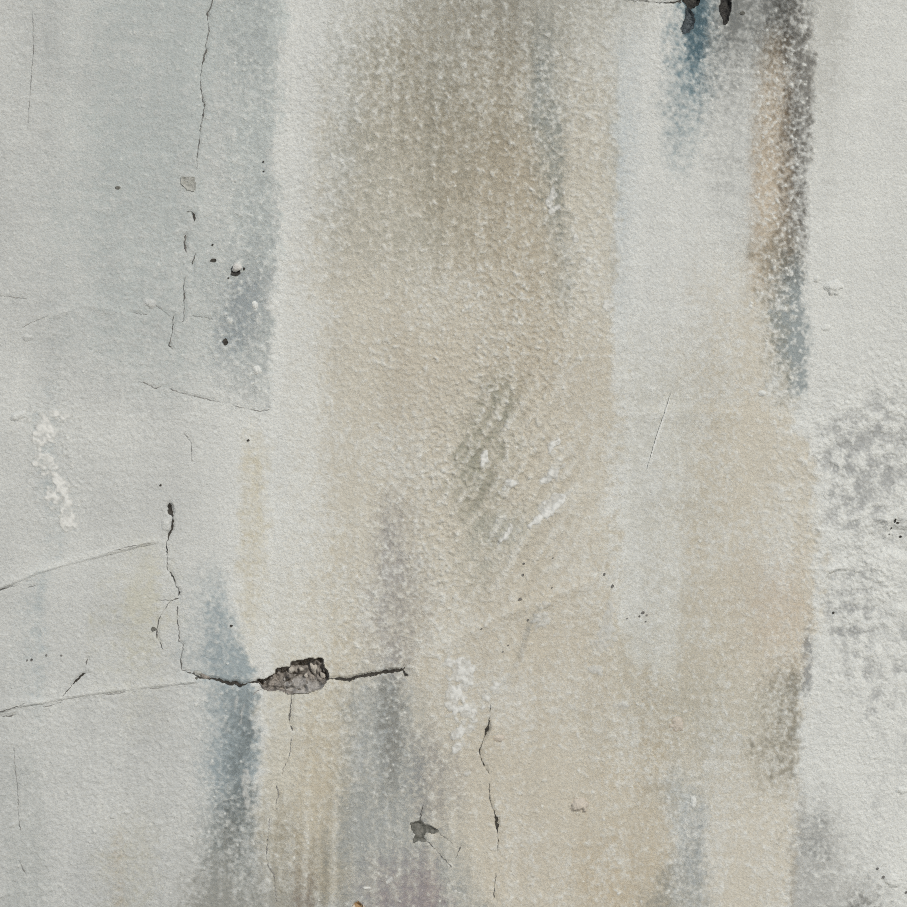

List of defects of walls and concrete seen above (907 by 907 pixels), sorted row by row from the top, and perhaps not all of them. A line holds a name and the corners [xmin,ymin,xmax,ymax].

crack [197,0,213,169]
leakage [785,32,815,103]
crack [135,211,212,347]
crack [108,503,261,695]
spalling [257,658,329,694]
crack [326,667,408,681]
spalling [410,820,439,843]
crack [479,709,499,842]